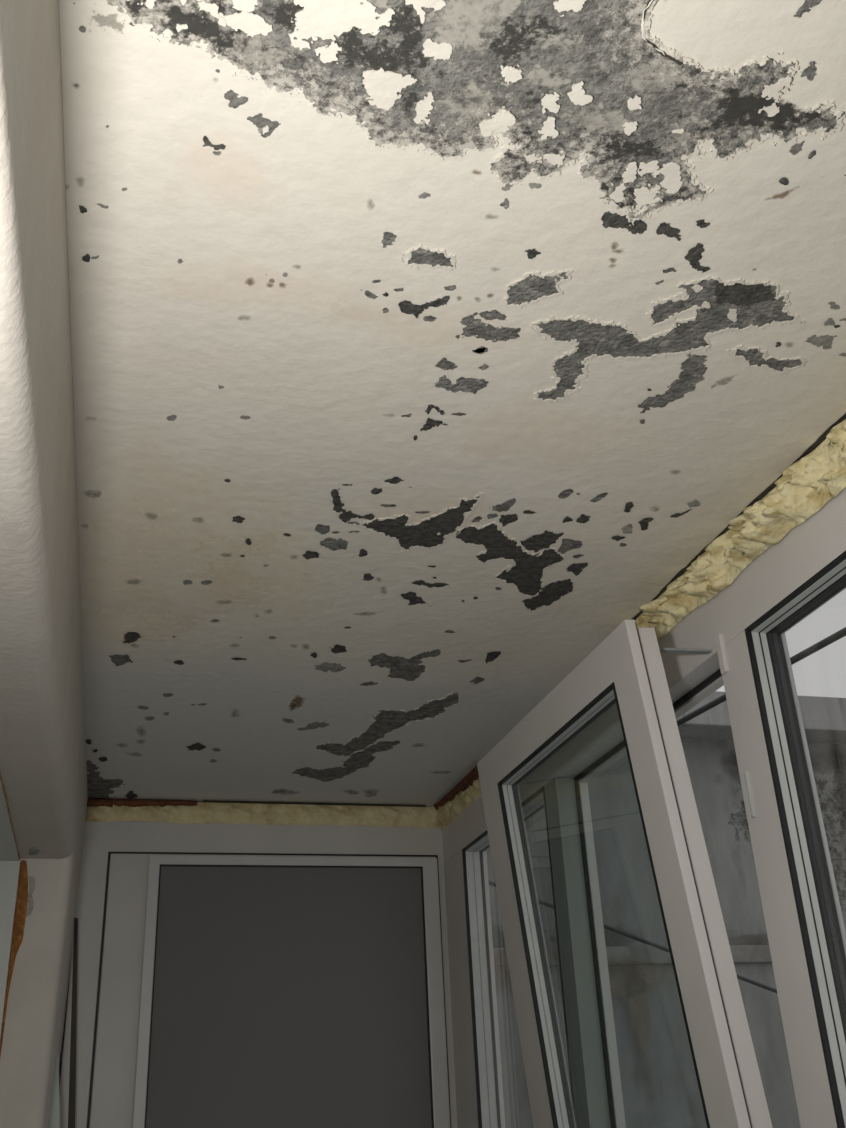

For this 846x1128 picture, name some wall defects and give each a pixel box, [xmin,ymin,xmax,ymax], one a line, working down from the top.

peeling [79,0,846,424]
peeling [612,502,657,547]
peeling [670,500,701,518]
peeling [294,477,608,611]
peeling [305,644,347,672]
peeling [360,649,441,686]
peeling [485,651,501,664]
peeling [282,718,329,731]
peeling [292,692,461,782]